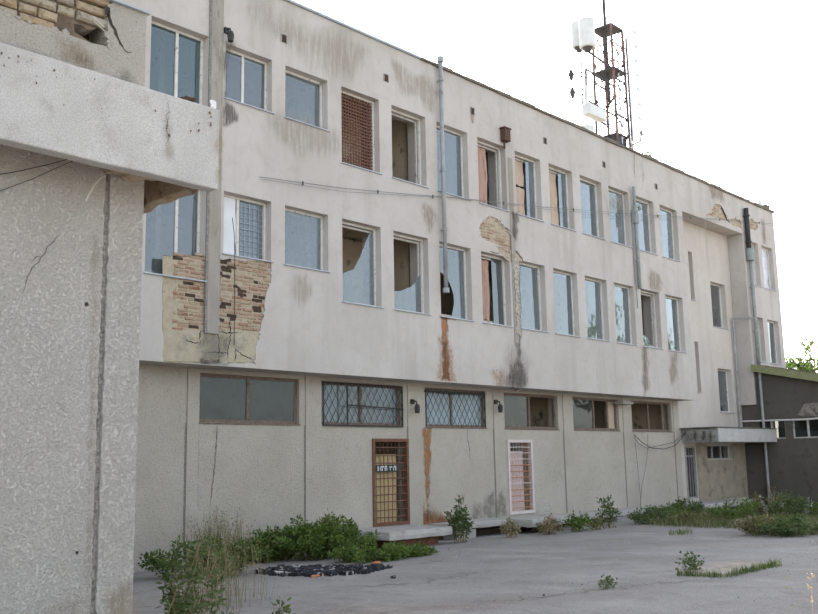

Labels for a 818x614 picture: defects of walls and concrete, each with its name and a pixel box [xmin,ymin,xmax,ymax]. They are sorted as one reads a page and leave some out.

flaking render [0,0,112,50]
spalling [707,204,758,230]
crack [22,236,58,294]
flaking render [162,252,205,331]
flaking render [219,259,273,345]
flaking render [479,215,523,337]
rust [441,317,451,381]
leakage [508,336,526,391]
rust [423,428,431,497]
rust [423,513,446,525]